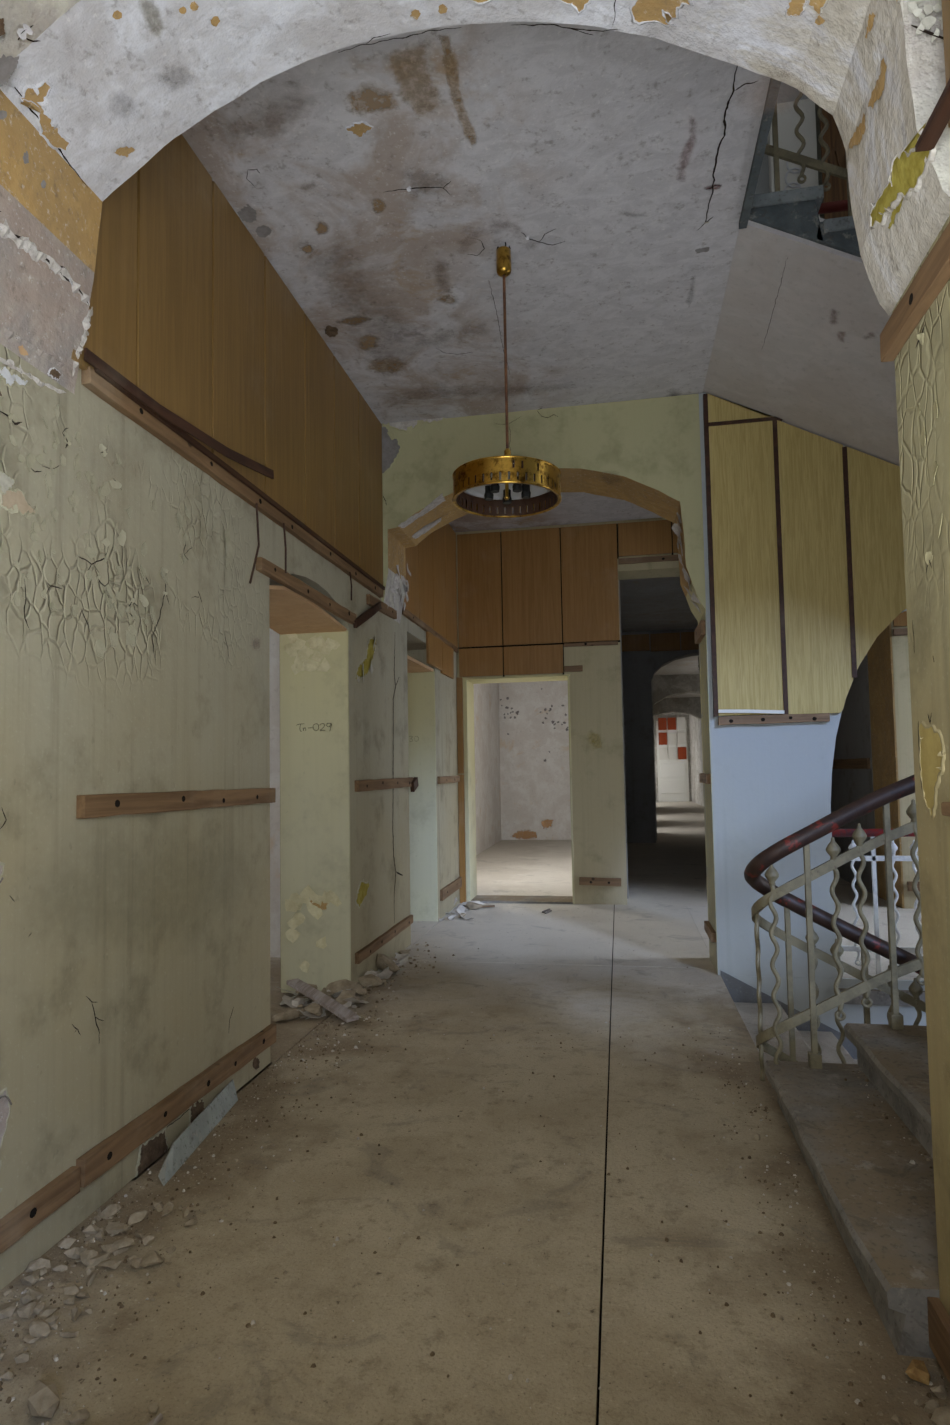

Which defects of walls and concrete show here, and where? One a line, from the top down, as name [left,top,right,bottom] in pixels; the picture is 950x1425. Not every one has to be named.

peeling [179,1,220,27]
peeling [629,0,694,30]
peeling [785,0,829,25]
peeling [885,0,943,30]
peeling [0,54,71,152]
leakage [350,36,475,143]
crack [698,66,759,230]
peeling [849,58,887,149]
peeling [869,115,936,229]
leakage [302,223,327,253]
flaking render [0,219,93,399]
leakage [339,317,401,372]